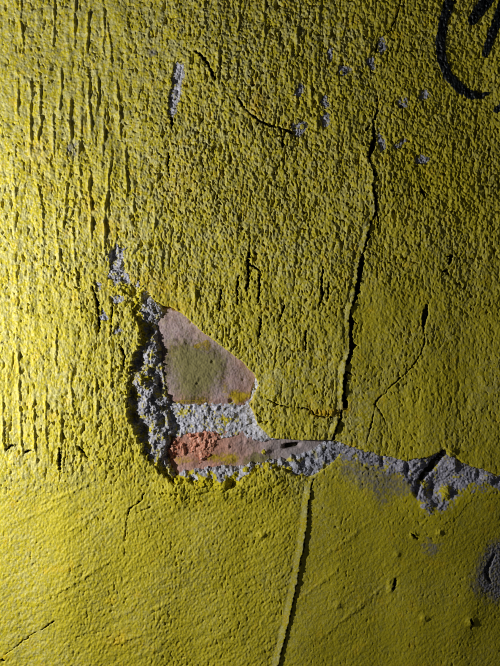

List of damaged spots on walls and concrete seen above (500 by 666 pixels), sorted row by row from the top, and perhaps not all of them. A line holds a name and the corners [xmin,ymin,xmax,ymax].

peeling [366,36,388,70]
peeling [167,61,185,129]
crack [237,97,293,148]
peeling [289,118,309,139]
peeling [294,83,305,98]
peeling [320,94,331,130]
peeling [374,128,409,153]
crack [267,96,379,441]
flaking render [94,241,500,526]
crack [369,304,428,432]
crack [279,479,314,663]